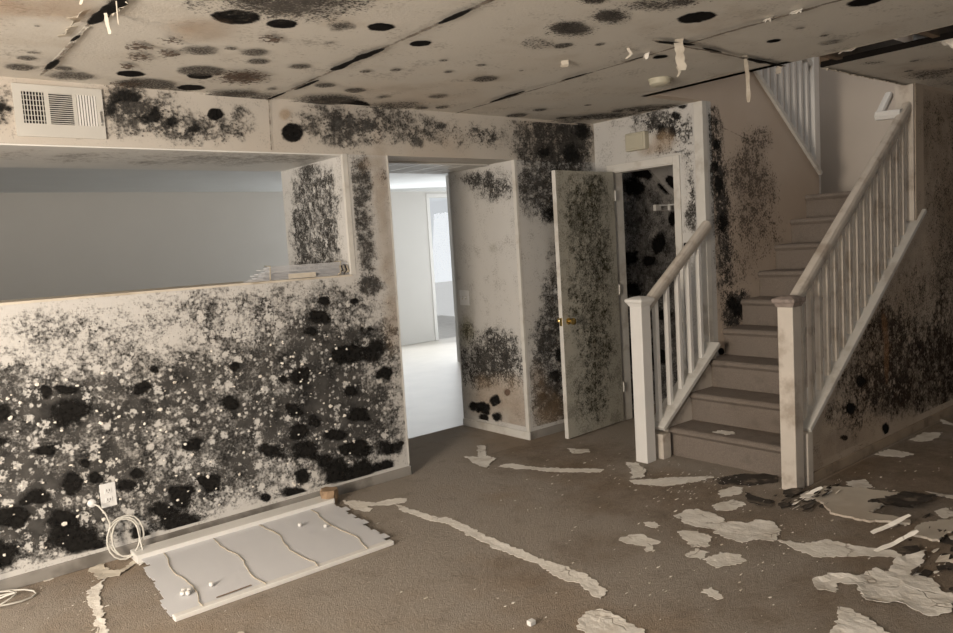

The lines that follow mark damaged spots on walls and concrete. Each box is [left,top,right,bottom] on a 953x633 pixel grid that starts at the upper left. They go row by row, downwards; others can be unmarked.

damp [210,9,297,28]
damp [367,23,395,31]
damp [522,0,716,49]
damp [6,52,36,71]
damp [49,67,93,80]
damp [102,47,276,144]
damp [708,106,780,327]
damp [0,83,696,570]
damp [825,260,953,446]